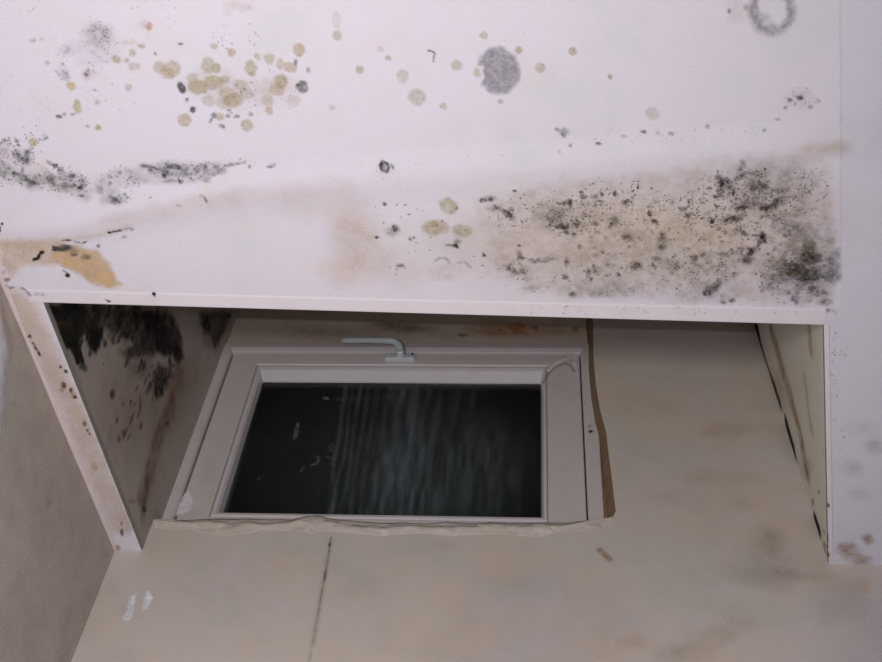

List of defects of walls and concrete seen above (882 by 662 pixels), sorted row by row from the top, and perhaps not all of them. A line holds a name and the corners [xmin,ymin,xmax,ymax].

mould [177,65,219,93]
leakage [33,239,116,287]
mould [538,182,629,238]
mould [651,168,838,304]
leakage [49,300,182,399]
mould [202,312,230,347]